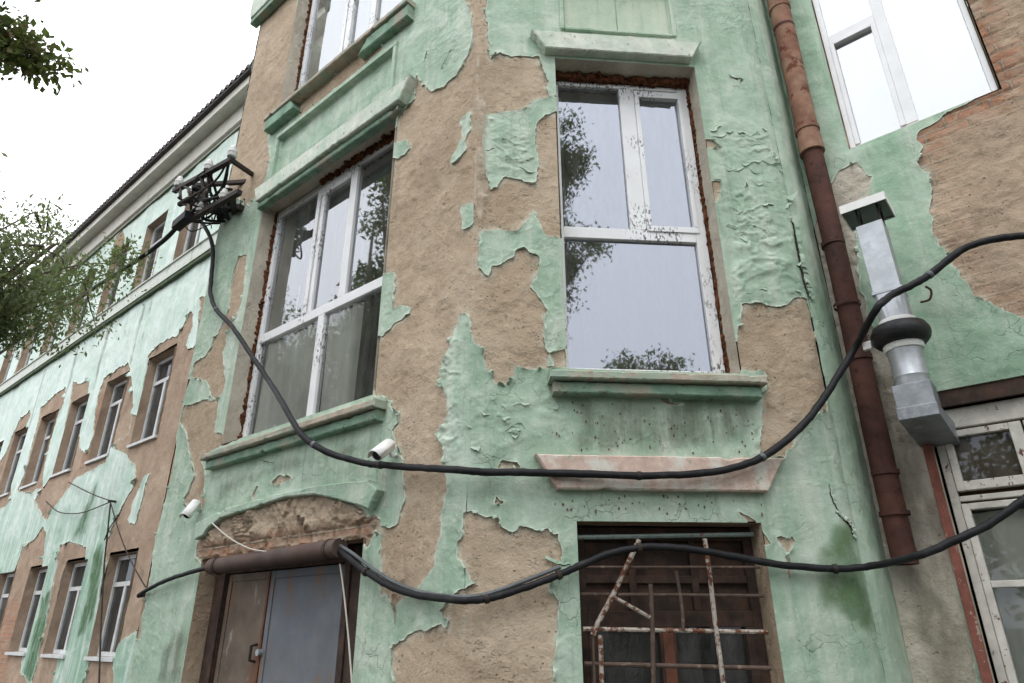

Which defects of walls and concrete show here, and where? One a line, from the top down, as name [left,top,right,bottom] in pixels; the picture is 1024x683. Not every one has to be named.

peeling [0,255,247,683]
peeling [197,0,566,611]
peeling [388,497,562,683]
peeling [705,297,826,459]
crack [829,483,857,538]
peeling [916,0,1024,318]